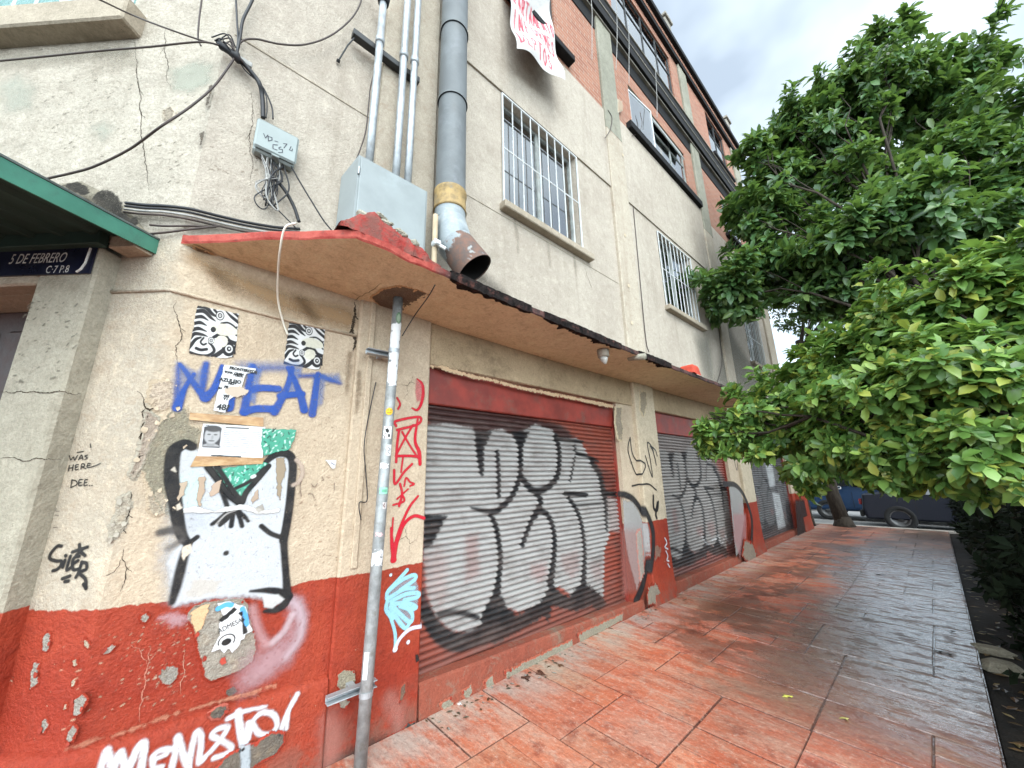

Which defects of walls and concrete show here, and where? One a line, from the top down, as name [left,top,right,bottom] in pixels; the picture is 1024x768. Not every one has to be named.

crack [133,32,171,189]
spalling [348,209,420,246]
crack [5,388,79,396]
peeling [106,377,202,544]
spalling [28,631,53,691]
spalling [62,636,120,750]
spalling [335,668,357,710]
spalling [439,612,623,710]
spalling [37,716,50,735]